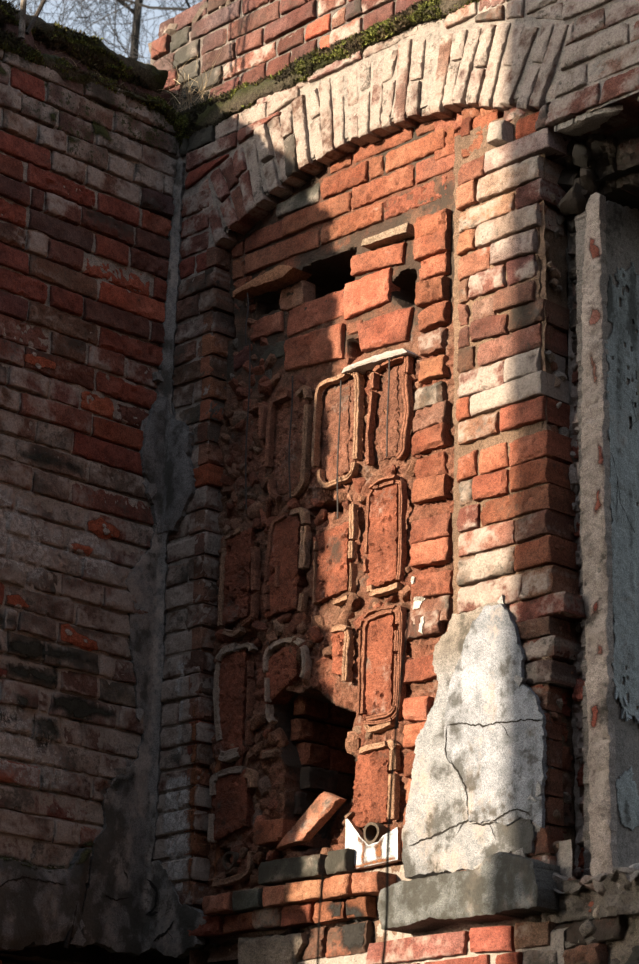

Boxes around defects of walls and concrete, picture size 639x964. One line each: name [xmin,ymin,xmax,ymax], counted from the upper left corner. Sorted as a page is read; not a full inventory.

spalling [589,238,600,259]
peeling [589,262,639,724]
peeling [0,158,207,959]
crack [409,719,577,846]
peeling [615,767,639,831]